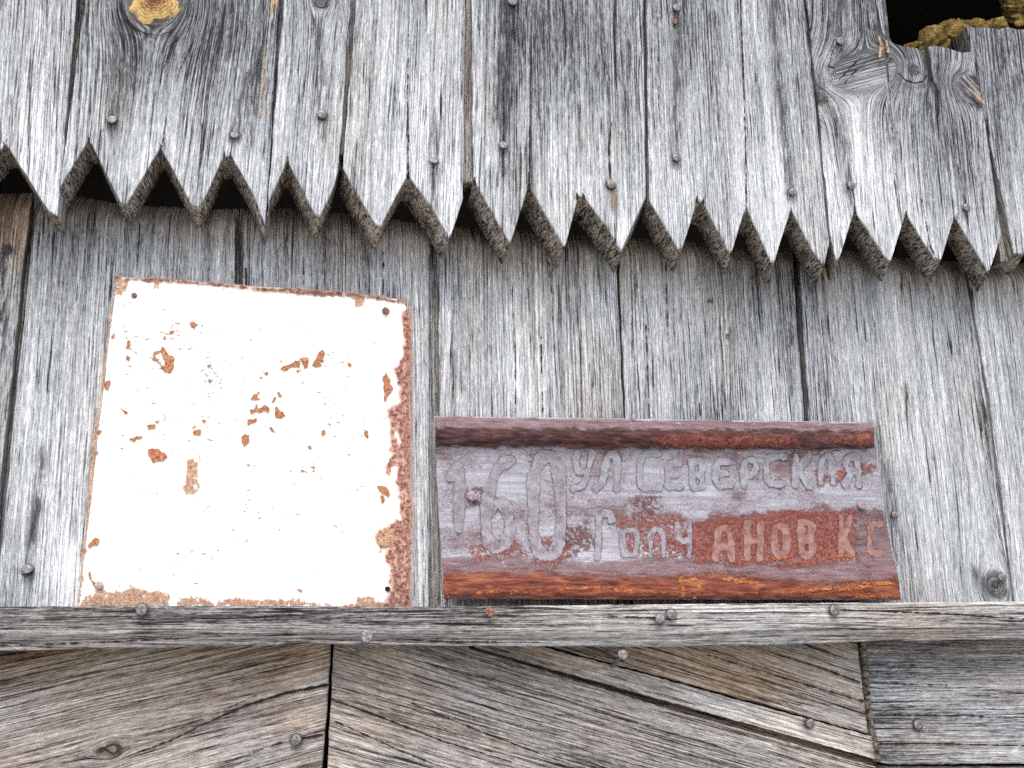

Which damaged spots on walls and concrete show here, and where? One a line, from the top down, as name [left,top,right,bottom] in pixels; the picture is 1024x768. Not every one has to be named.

corrosion [77,276,415,607]
corrosion [466,487,505,514]
corrosion [434,417,874,481]
corrosion [815,464,876,486]
corrosion [442,493,901,600]